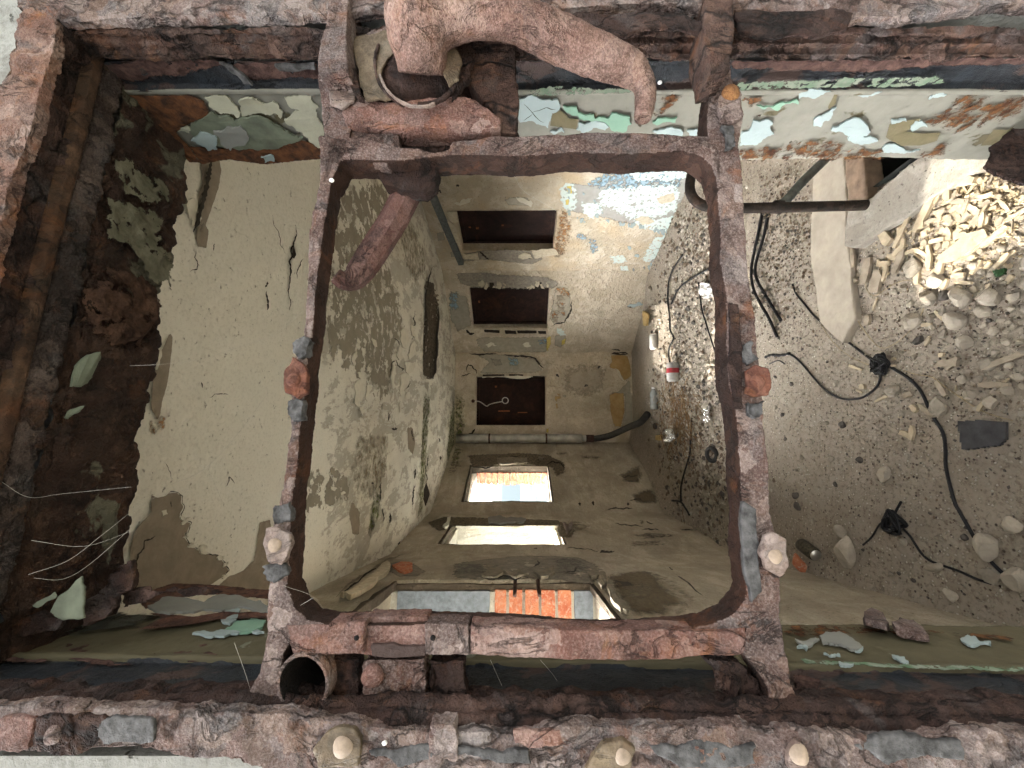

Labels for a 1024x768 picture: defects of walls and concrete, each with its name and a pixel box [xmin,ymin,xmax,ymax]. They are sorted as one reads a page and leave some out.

peeling [177,95,324,248]
corrosion [739,140,884,162]
peeling [737,76,947,154]
corrosion [920,95,1024,186]
peeling [981,125,1015,146]
crack [265,222,303,310]
corrosion [555,211,571,257]
peeling [559,171,687,272]
corrosion [550,288,572,326]
peeling [33,576,86,620]
peeling [130,491,271,639]